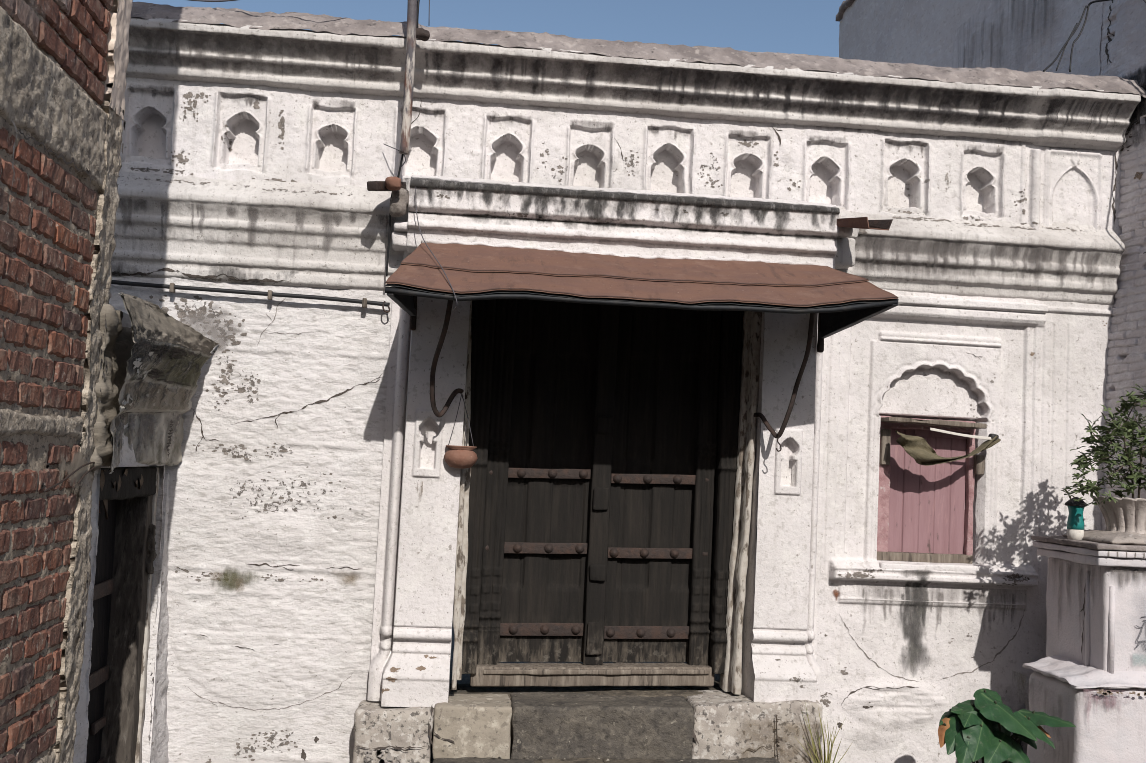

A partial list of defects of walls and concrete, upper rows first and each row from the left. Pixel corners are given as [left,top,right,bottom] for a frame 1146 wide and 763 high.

damp [426,52,1027,132]
damp [1040,96,1143,127]
damp [249,207,257,244]
damp [403,177,840,240]
peeling [149,295,261,411]
crack [119,344,218,457]
crack [238,372,384,428]
peeling [193,443,363,519]
damp [902,570,942,670]
crack [839,612,1024,708]